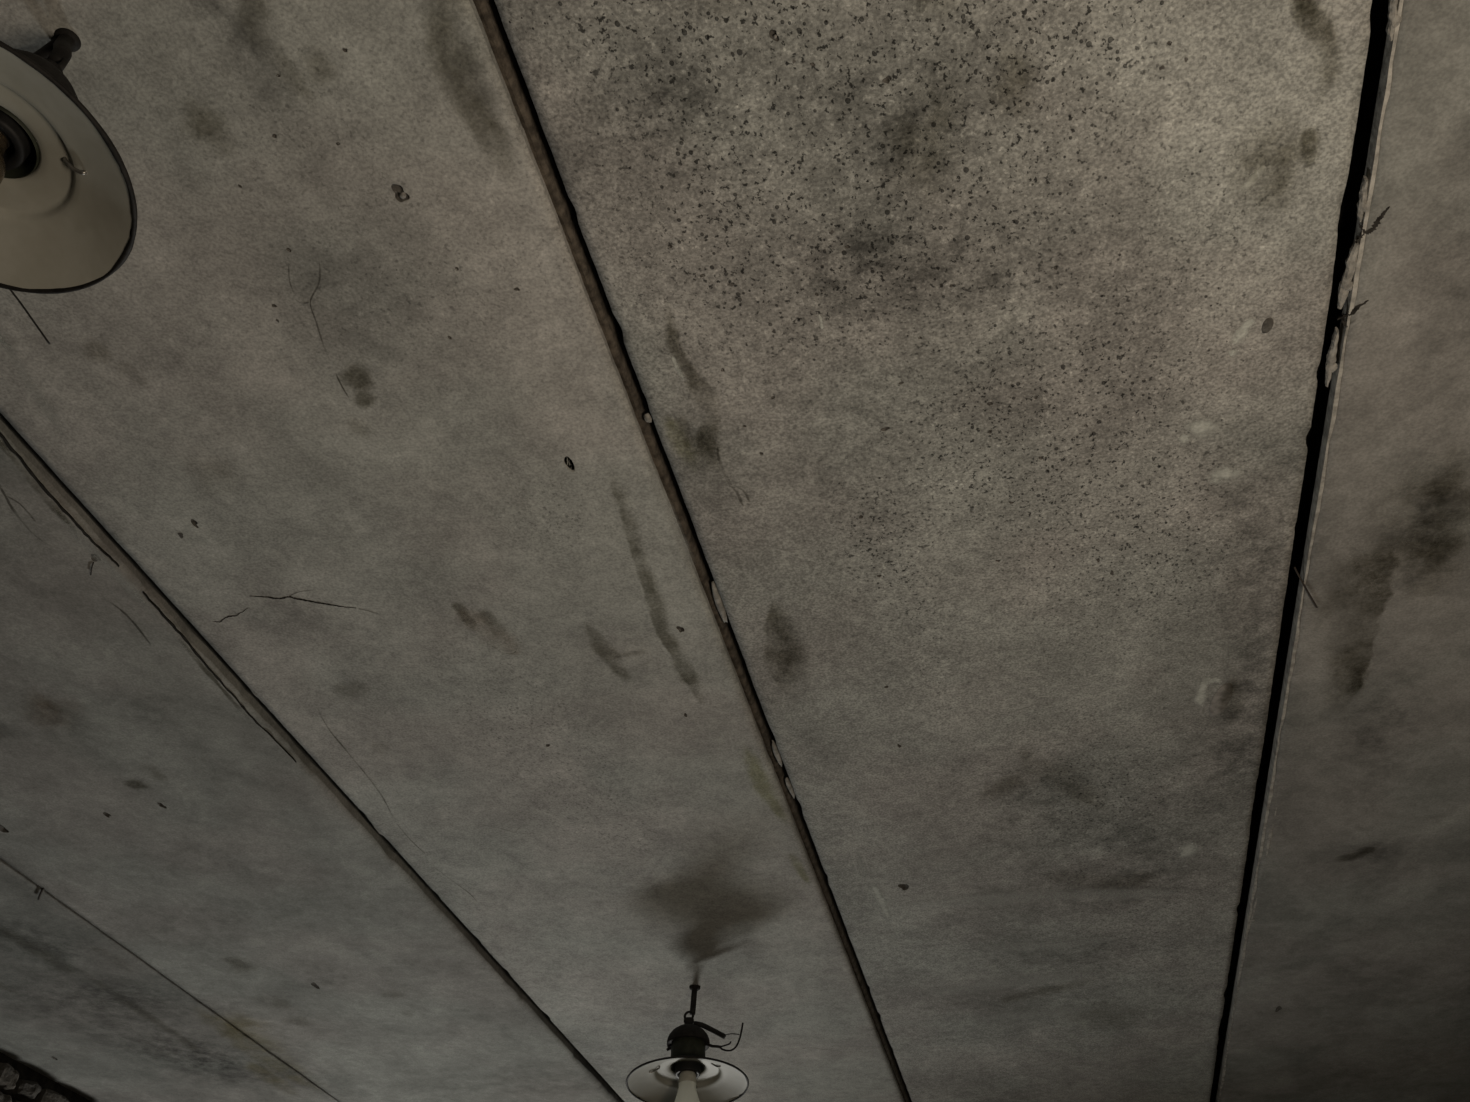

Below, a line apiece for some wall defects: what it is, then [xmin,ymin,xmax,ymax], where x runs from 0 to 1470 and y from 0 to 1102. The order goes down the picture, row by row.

crack [215,593,354,623]